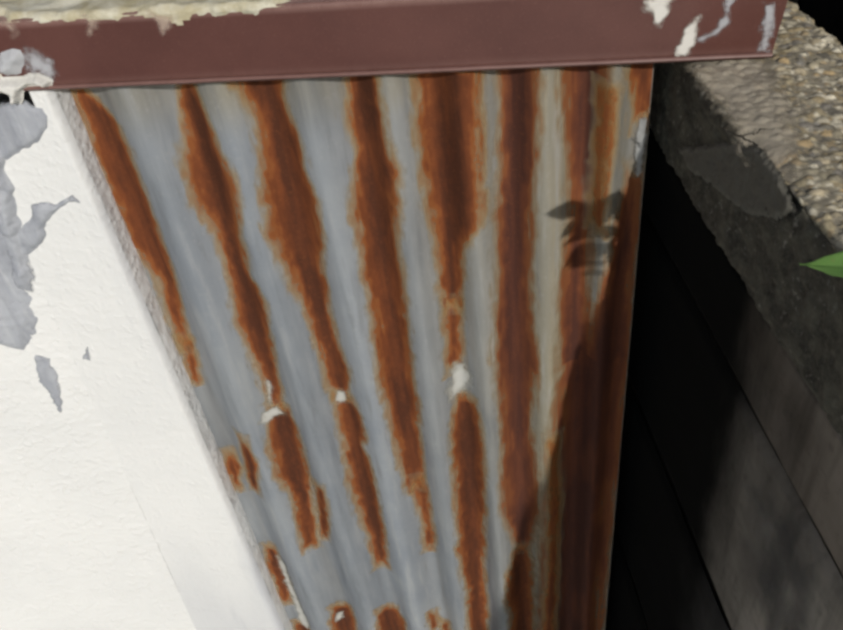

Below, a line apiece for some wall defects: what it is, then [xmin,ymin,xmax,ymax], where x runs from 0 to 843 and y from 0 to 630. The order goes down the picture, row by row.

rust [69,88,204,387]
rust [176,84,330,556]
rust [222,80,391,572]
rust [344,75,436,552]
rust [409,63,653,630]
crack [723,128,770,151]
rust [263,541,295,605]
rust [290,619,310,630]
rust [327,602,357,630]
rust [374,603,407,630]